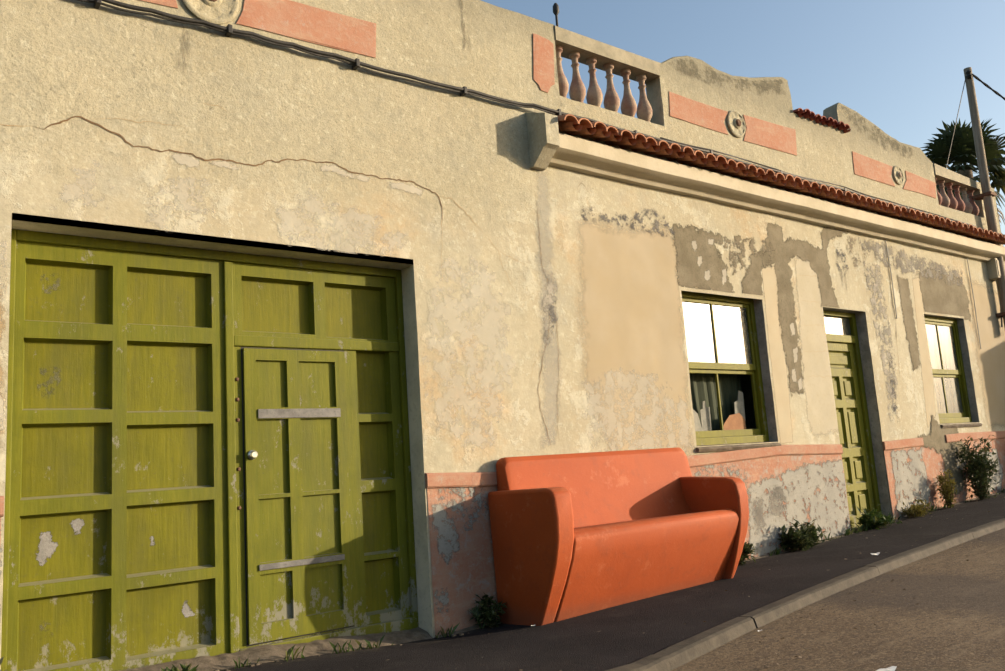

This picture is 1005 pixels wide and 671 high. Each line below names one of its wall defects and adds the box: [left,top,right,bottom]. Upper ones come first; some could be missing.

crack [0,116,548,290]
flaking render [672,223,848,396]
flaking render [897,269,971,371]
crack [532,311,559,448]
peeling [35,531,58,566]
peeling [432,487,487,564]
peeling [694,459,851,558]
peeling [891,415,1003,518]